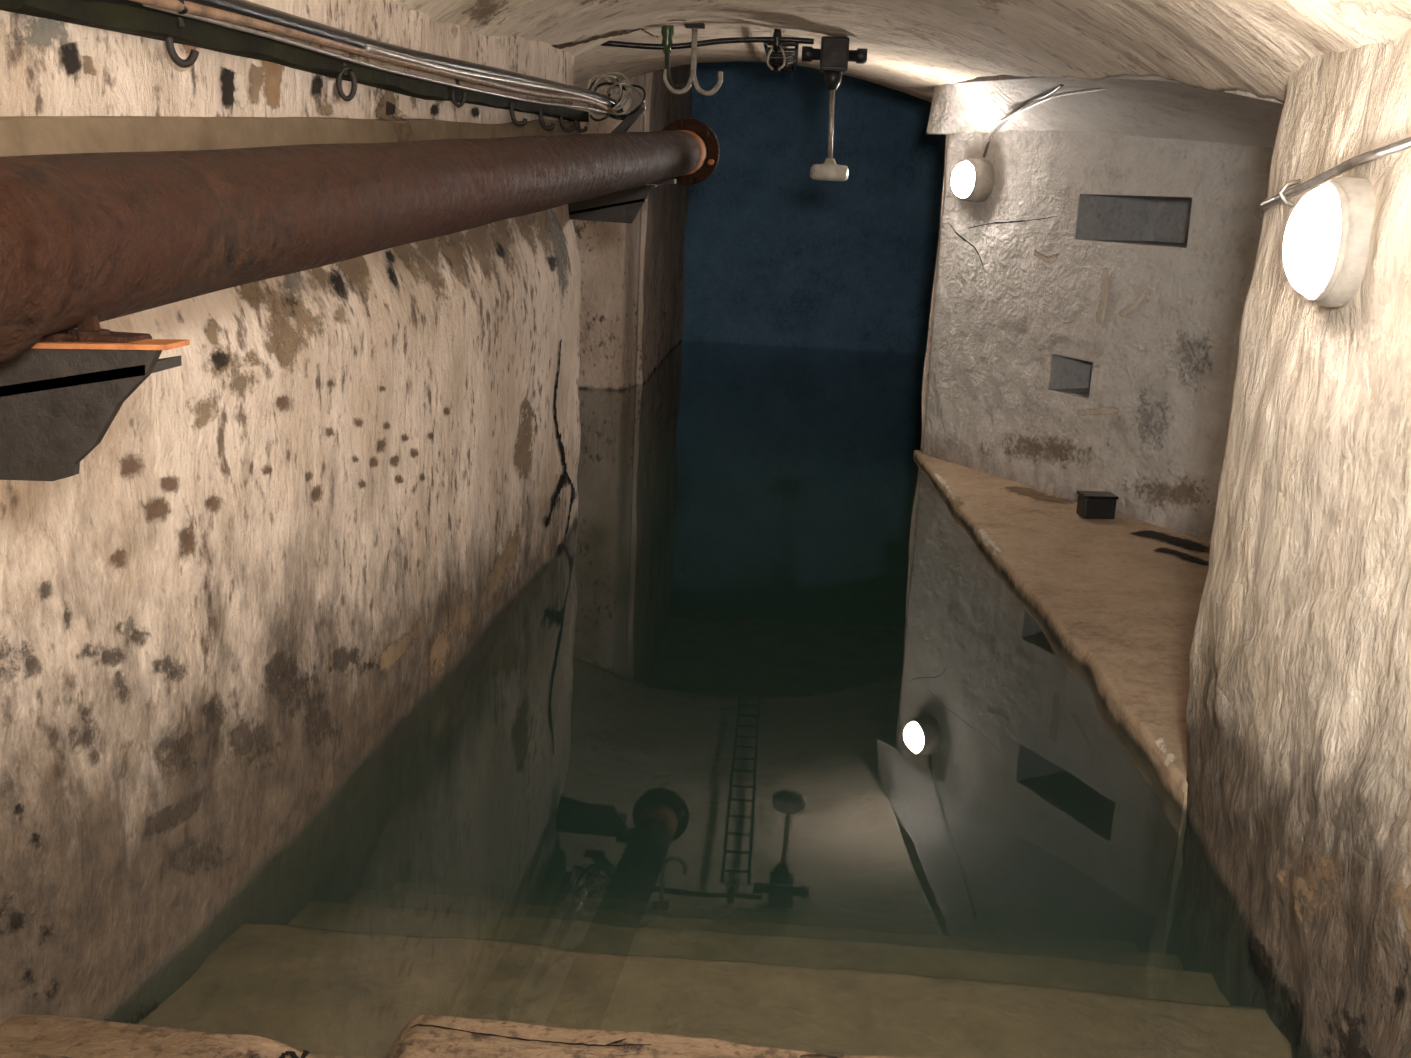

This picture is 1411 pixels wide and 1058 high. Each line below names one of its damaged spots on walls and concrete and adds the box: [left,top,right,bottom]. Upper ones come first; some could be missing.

crack [543,339,577,553]
damp [41,581,51,598]
damp [0,643,41,678]
damp [76,621,149,700]
damp [153,655,186,681]
damp [72,707,98,762]
damp [155,727,195,776]
damp [203,698,281,768]
damp [146,791,202,840]
damp [1248,929,1302,1058]
crack [800,1050,844,1058]
damp [1323,1010,1370,1058]